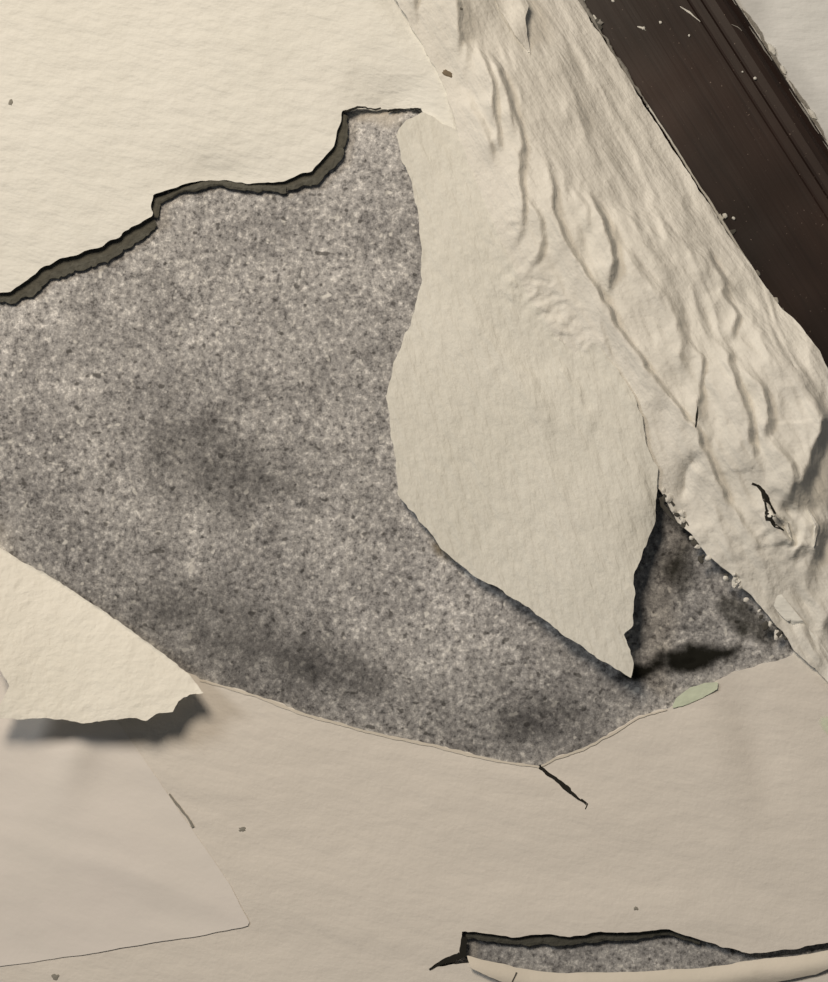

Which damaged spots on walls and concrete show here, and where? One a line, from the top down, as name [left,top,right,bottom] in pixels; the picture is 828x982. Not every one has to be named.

peeling [0,109,795,768]
damp [723,600,773,638]
damp [618,643,738,680]
crack [539,765,588,809]
peeling [0,718,249,966]
spalling [440,929,828,973]